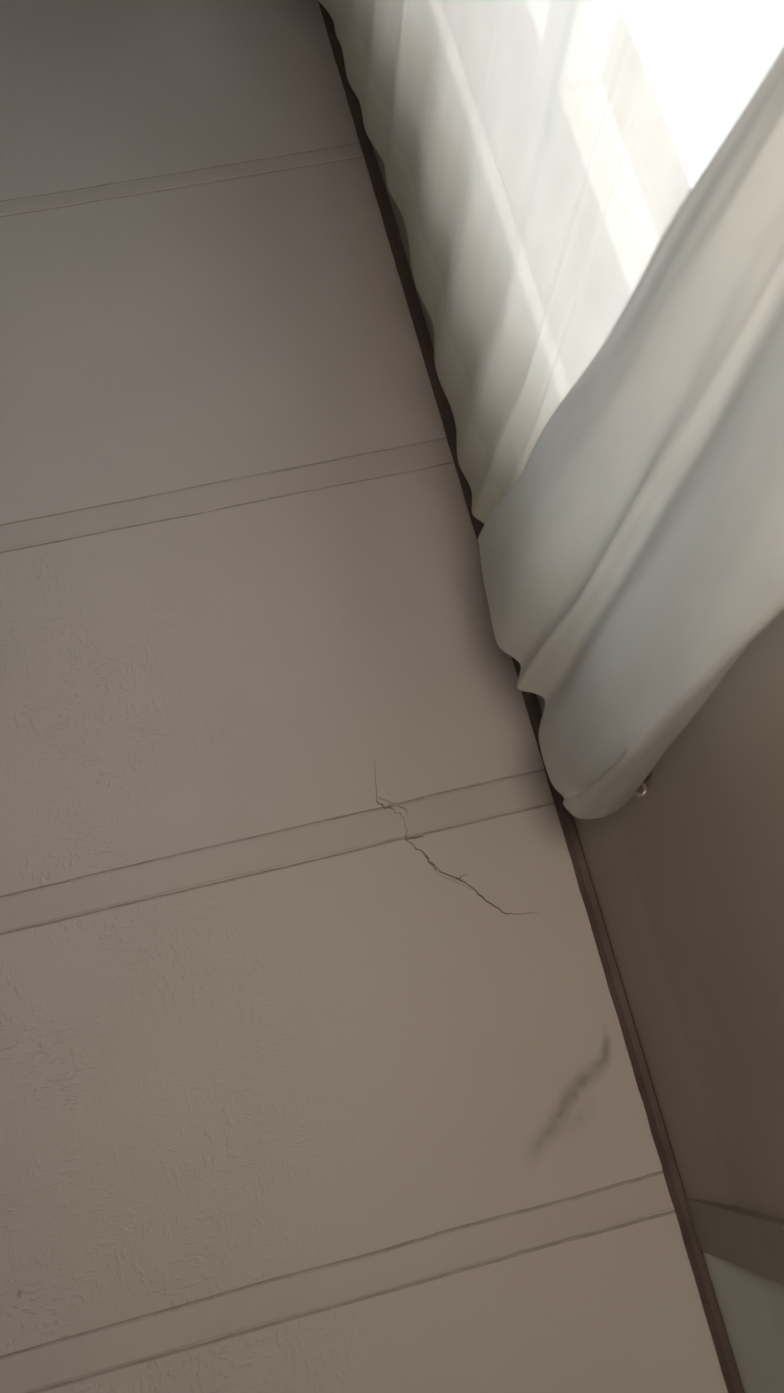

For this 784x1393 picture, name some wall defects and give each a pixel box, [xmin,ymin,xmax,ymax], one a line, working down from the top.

crack [374,762,540,915]